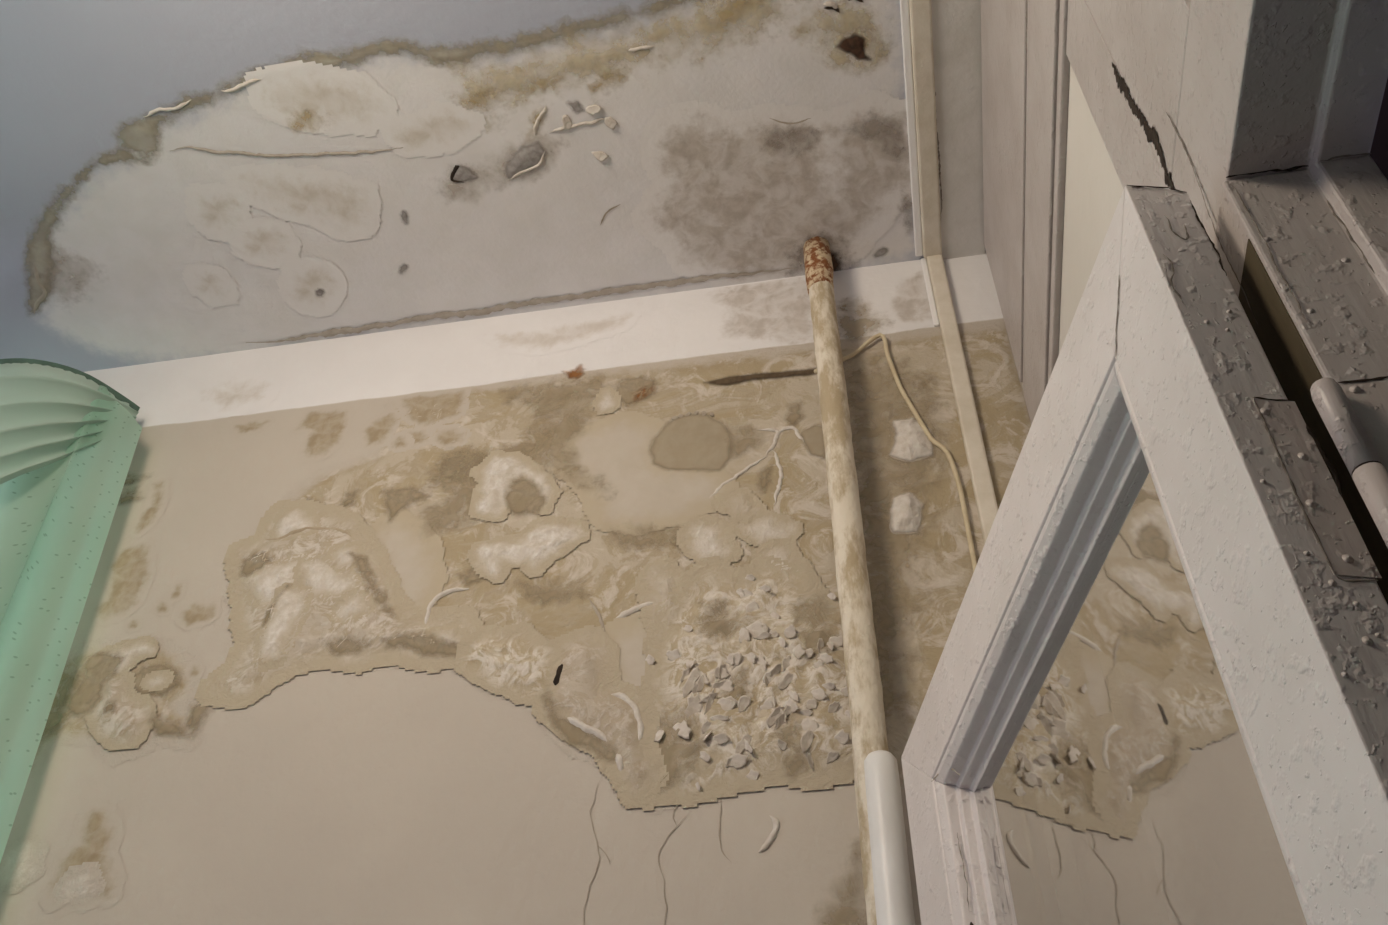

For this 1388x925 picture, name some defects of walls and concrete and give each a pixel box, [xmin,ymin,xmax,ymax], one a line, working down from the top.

spalling [830,29,870,67]
peeling [450,165,477,183]
water stain [9,0,984,799]
peeling [709,426,804,505]
peeling [889,493,921,535]
peeling [890,418,932,462]
water stain [958,321,1031,509]
peeling [639,555,854,811]
peeling [0,798,129,913]
crack [583,779,610,925]
water stain [647,797,729,815]
crack [658,802,731,925]